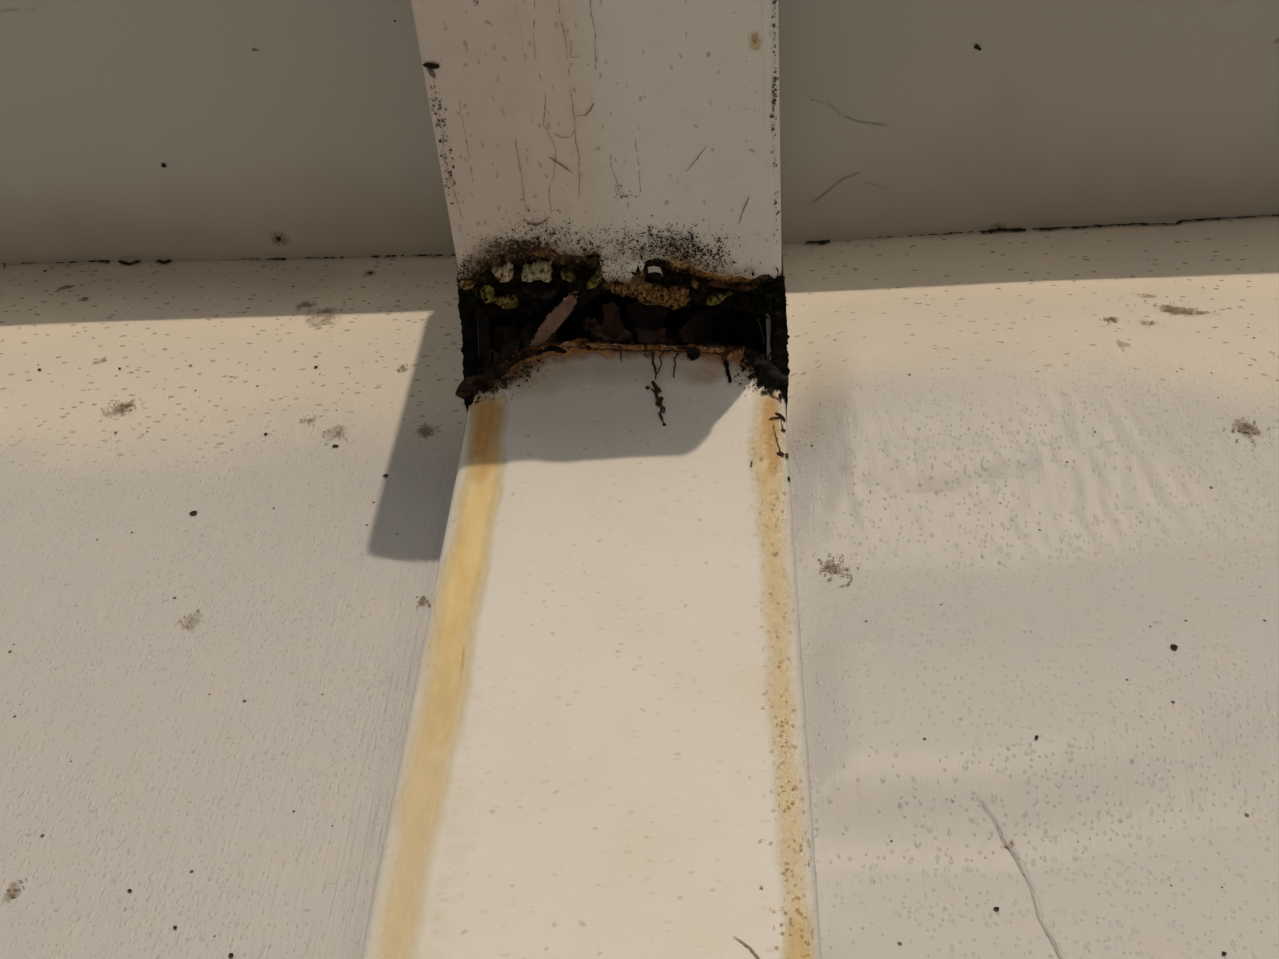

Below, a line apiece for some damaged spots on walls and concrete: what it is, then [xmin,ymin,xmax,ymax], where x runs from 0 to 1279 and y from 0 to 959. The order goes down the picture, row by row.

peeling [459,248,757,310]
damp [455,199,774,299]